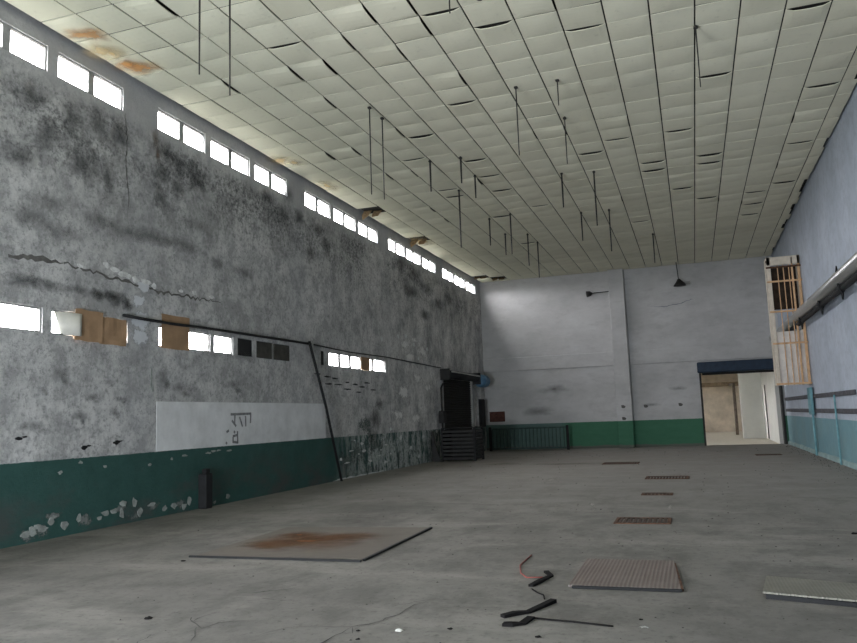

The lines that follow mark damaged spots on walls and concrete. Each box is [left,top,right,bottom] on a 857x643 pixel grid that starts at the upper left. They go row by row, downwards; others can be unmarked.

crack [8,254,221,303]
peeling [15,497,192,542]
crack [190,598,437,643]